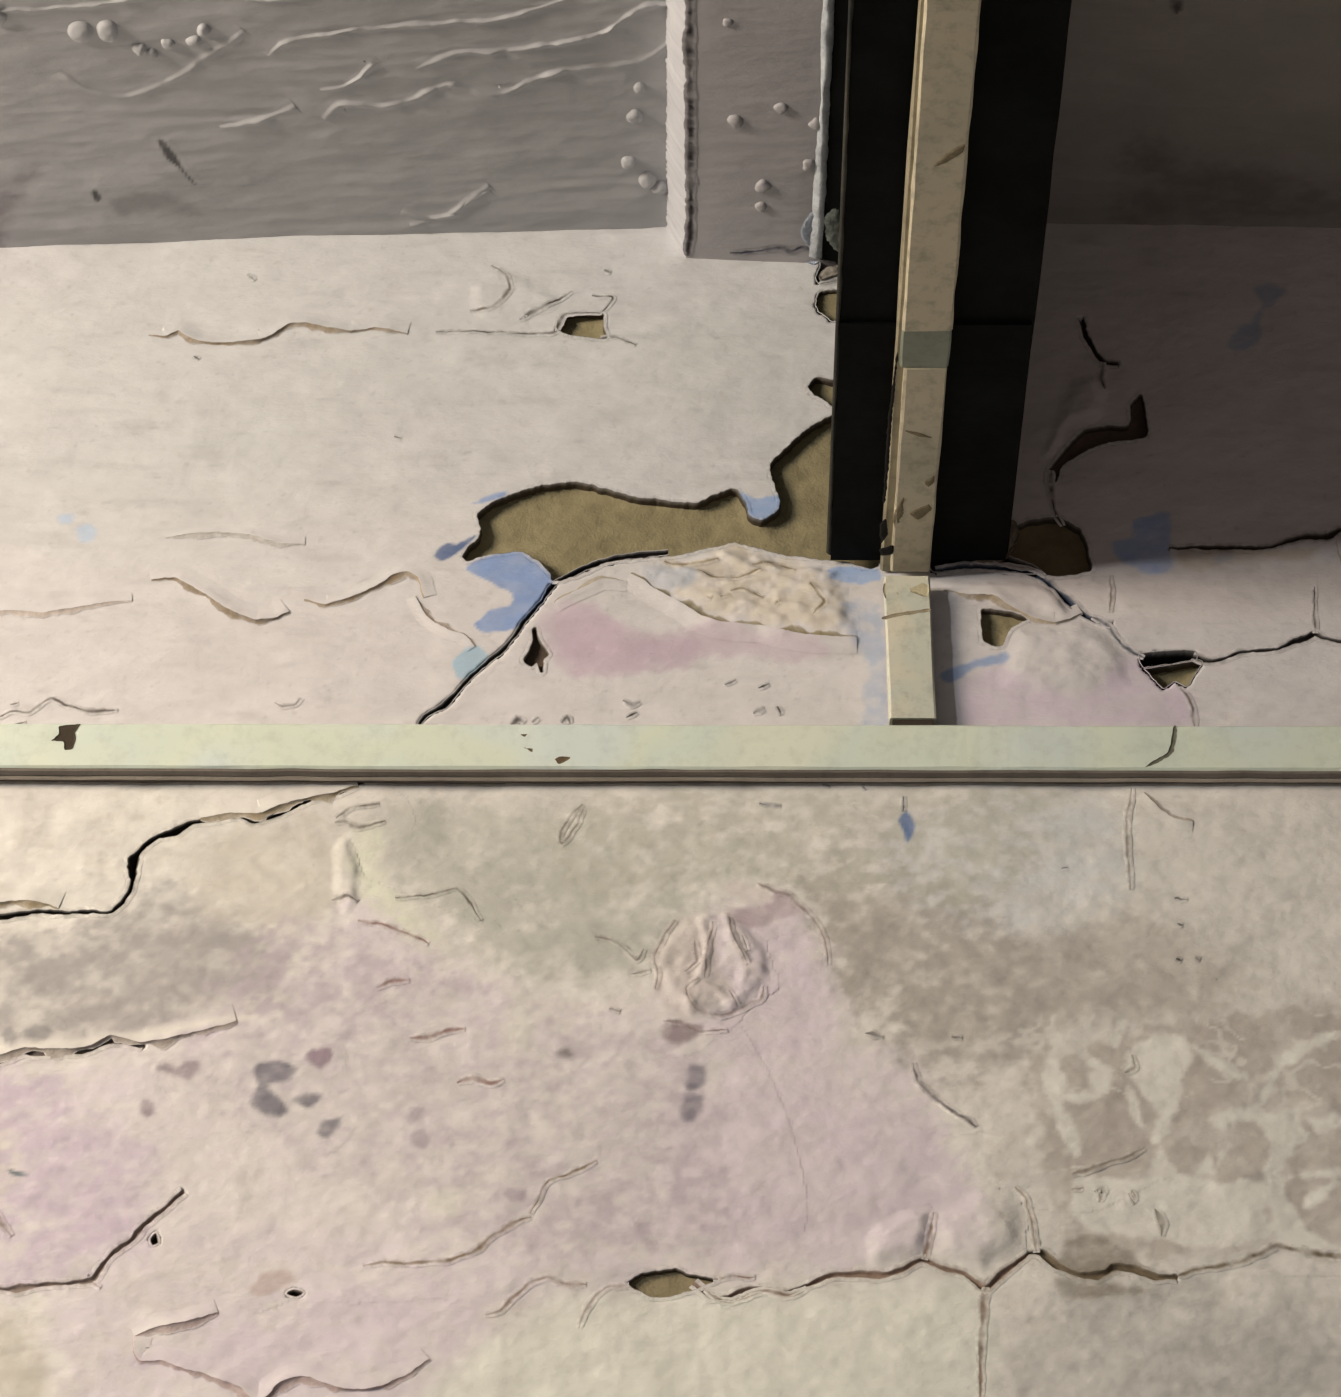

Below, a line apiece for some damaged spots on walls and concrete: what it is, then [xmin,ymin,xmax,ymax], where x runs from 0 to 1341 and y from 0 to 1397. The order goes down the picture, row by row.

flaking render [801,209,840,322]
flaking render [554,309,610,342]
flaking render [1044,392,1152,486]
peeling [148,564,290,625]
flaking render [304,375,892,689]
crack [418,549,829,724]
crack [935,561,1145,660]
crack [1168,525,1341,554]
crack [0,782,386,924]
damp [0,782,1341,1397]
crack [0,1187,188,1297]
crack [689,1185,1341,1397]